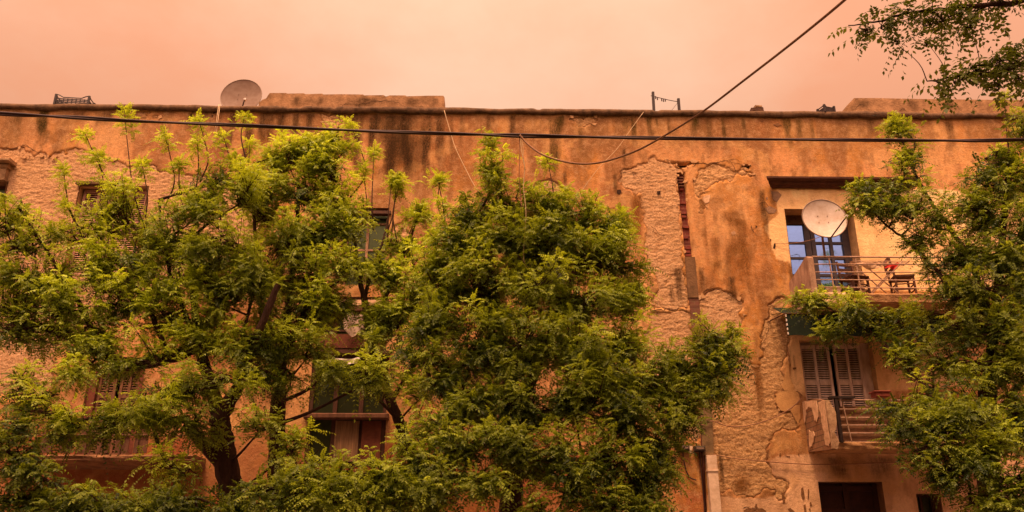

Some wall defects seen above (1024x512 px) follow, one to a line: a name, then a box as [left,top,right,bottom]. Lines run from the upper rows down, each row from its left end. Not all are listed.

damp [351,115,443,172]
flaking render [0,146,261,275]
flaking render [0,276,60,401]
flaking render [58,255,197,333]
flaking render [617,157,812,512]